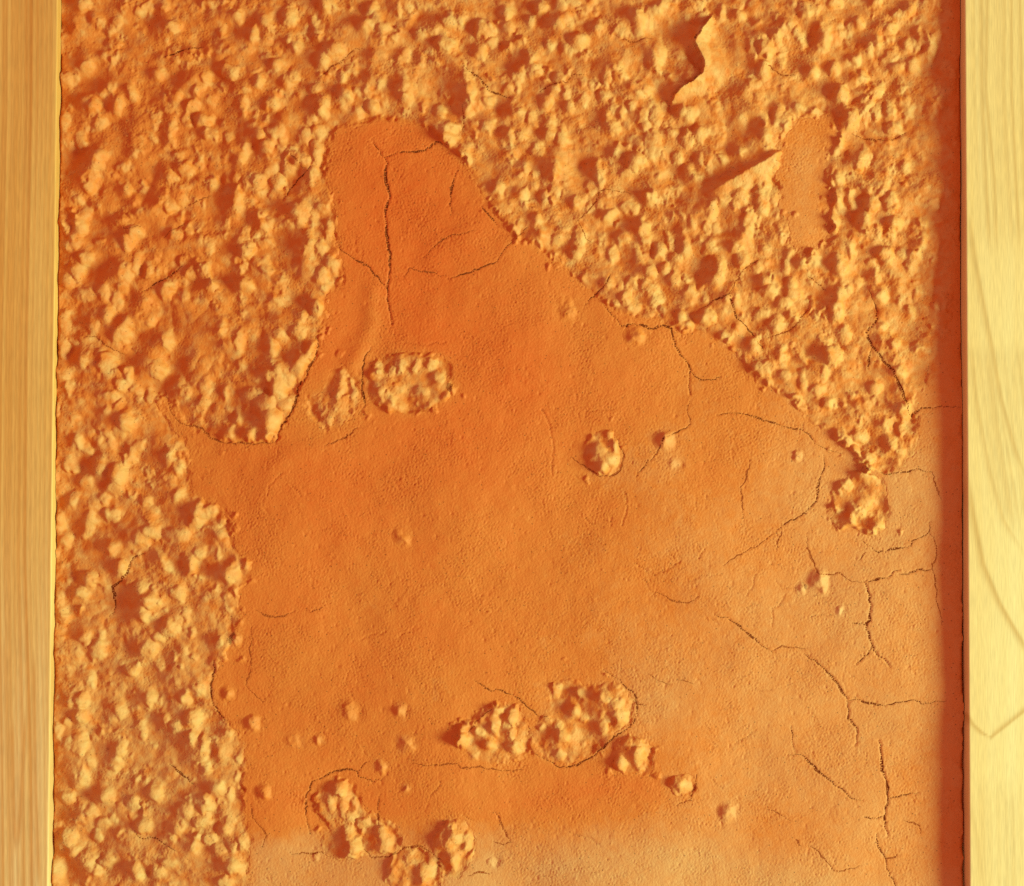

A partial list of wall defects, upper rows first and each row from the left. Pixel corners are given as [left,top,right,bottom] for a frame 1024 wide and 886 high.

peeling [671,15,736,107]
crack [339,108,525,317]
crack [573,276,719,477]
crack [866,290,949,417]
crack [720,413,942,667]
crack [416,669,693,771]
crack [718,616,942,886]